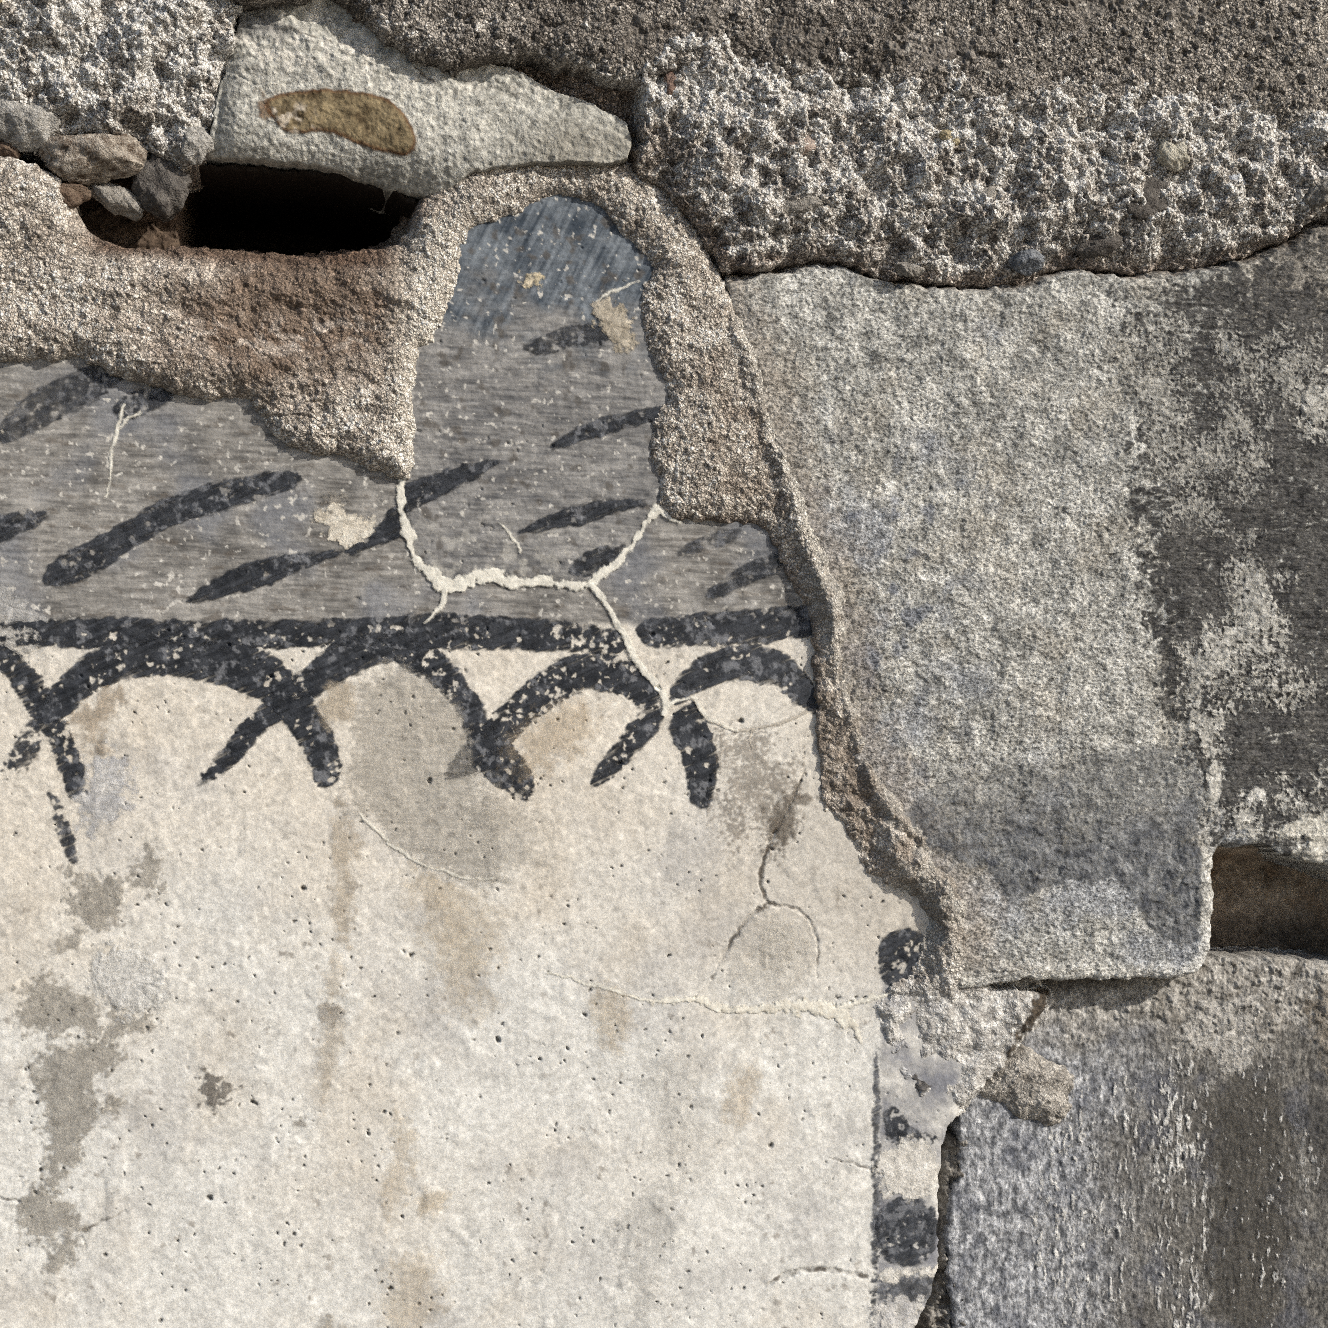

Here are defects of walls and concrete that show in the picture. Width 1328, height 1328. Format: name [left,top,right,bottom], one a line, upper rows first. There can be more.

spalling [79,164,418,256]
spalling [518,271,545,288]
crack [597,282,633,301]
spalling [592,296,639,353]
crack [397,479,808,749]
crack [729,825,794,945]